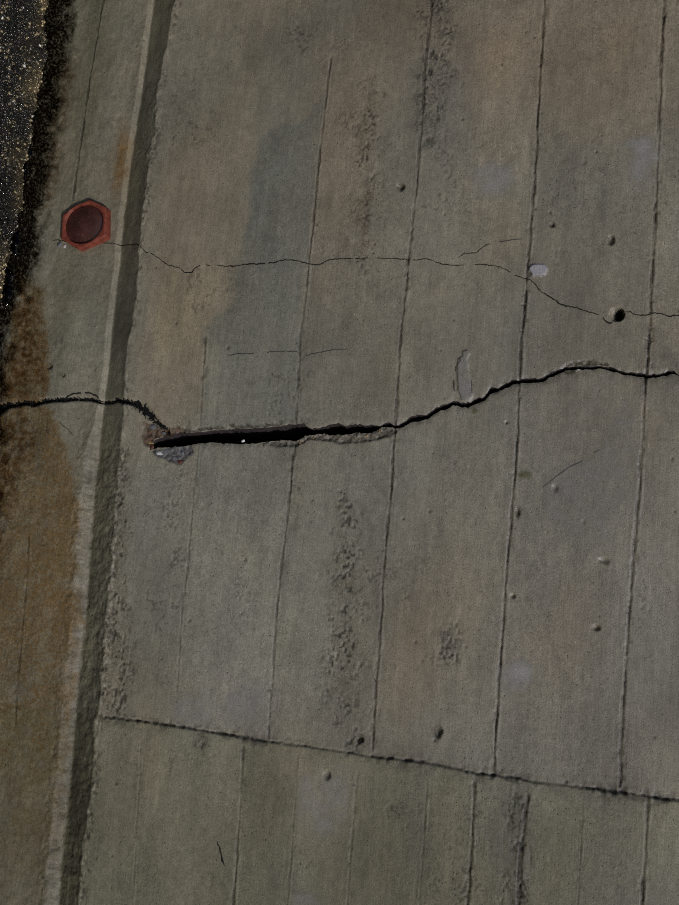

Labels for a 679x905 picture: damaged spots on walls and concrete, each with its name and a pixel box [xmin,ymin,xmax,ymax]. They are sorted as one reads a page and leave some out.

crack [103,239,679,324]
crack [232,348,346,356]
spalling [142,422,193,464]
crack [0,361,679,449]